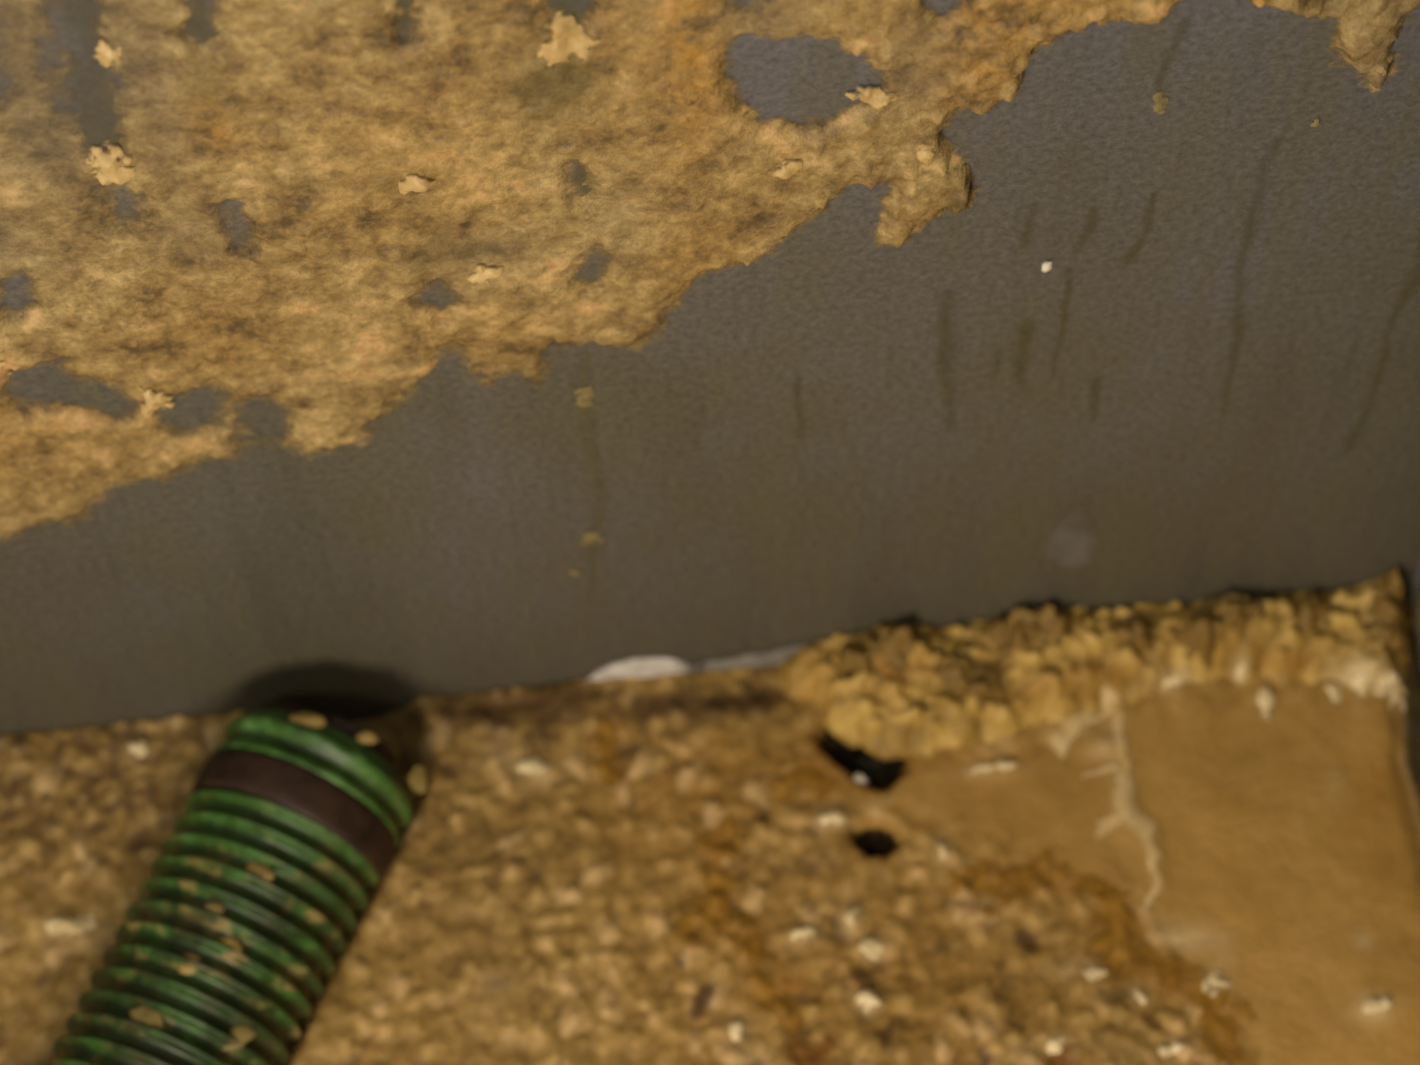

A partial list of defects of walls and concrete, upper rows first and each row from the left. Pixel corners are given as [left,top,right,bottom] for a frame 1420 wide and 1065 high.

leakage [180,0,206,44]
peeling [1250,0,1420,93]
leakage [84,59,119,151]
peeling [0,0,1179,538]
peeling [819,810,847,826]
crack [1050,686,1162,914]